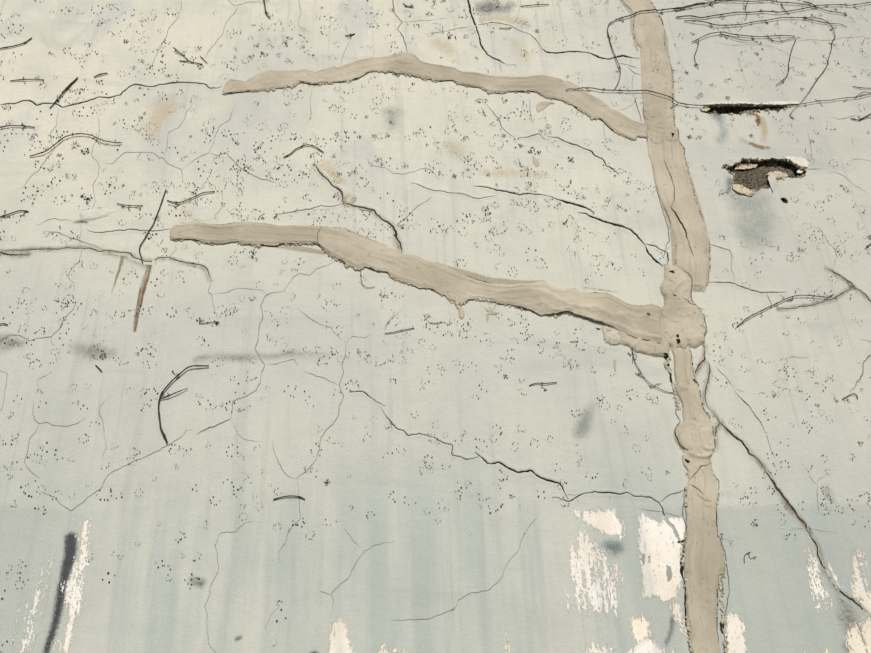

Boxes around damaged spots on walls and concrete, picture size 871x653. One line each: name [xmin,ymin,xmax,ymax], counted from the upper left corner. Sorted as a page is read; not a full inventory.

crack [484,103,621,176]
spalling [700,101,799,116]
spalling [721,156,809,203]
crack [0,228,216,294]
corrosion [134,265,151,332]
crack [776,266,871,312]
crack [199,265,327,433]
crack [733,390,771,449]
peeling [11,516,93,653]
peeling [638,513,690,640]
peeling [803,536,871,653]
peeling [723,611,748,653]